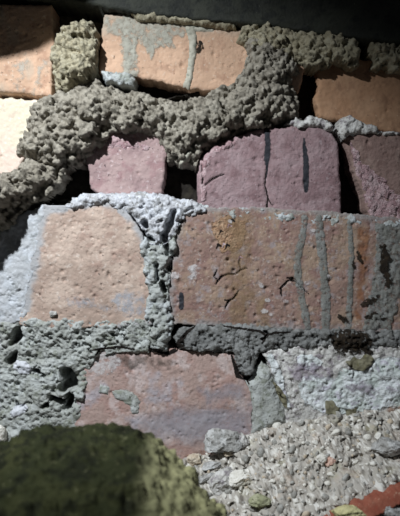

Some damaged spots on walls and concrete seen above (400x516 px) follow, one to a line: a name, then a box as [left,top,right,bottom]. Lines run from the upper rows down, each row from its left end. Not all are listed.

crack [264,171,272,208]
crack [213,255,247,284]
crack [224,290,239,309]
crack [279,277,309,296]